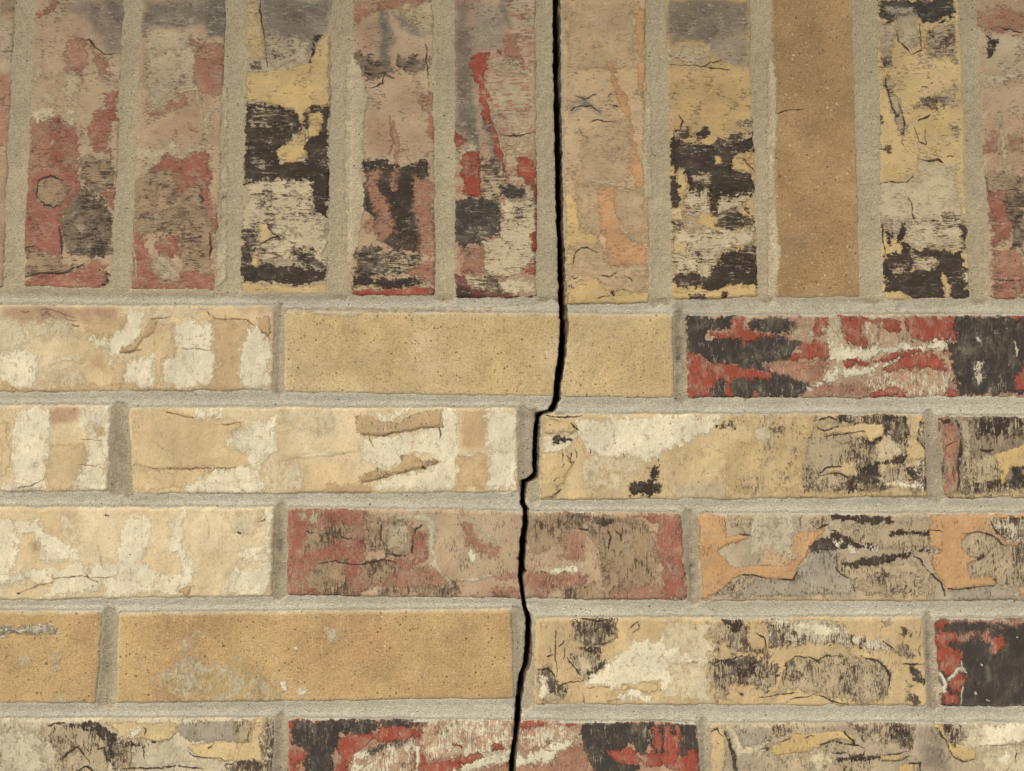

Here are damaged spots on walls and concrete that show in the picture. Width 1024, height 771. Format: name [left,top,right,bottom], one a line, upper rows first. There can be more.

crack [508,0,569,771]